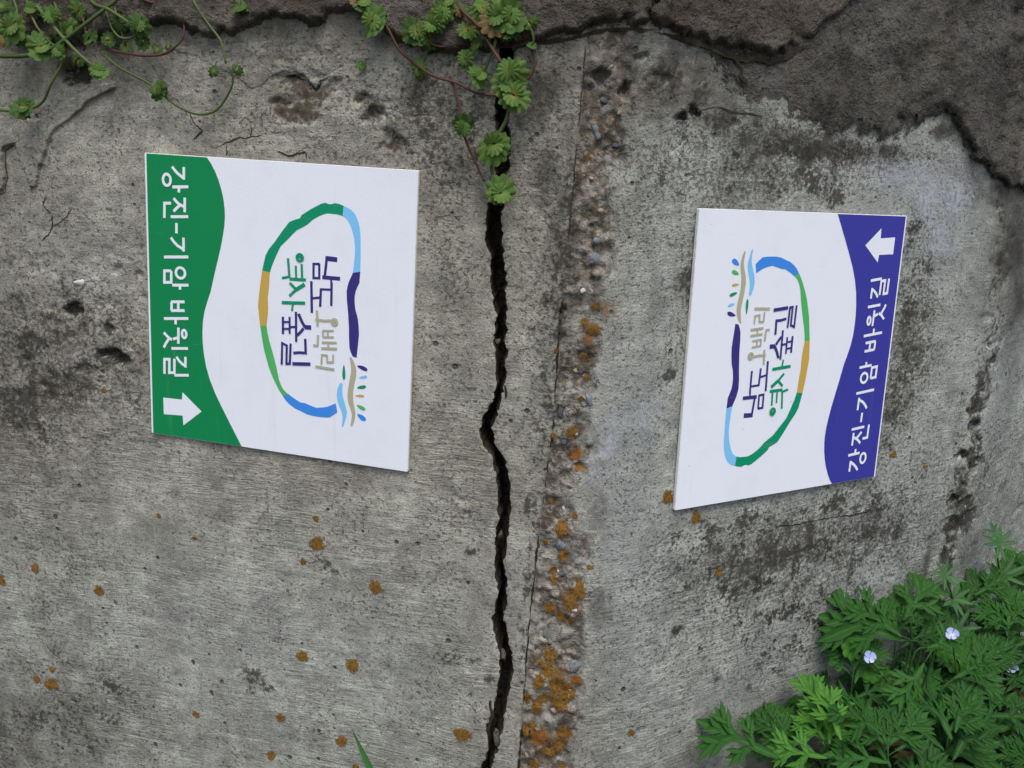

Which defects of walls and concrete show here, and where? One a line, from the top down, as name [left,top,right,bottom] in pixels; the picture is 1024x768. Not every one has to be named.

crack [479,27,811,768]